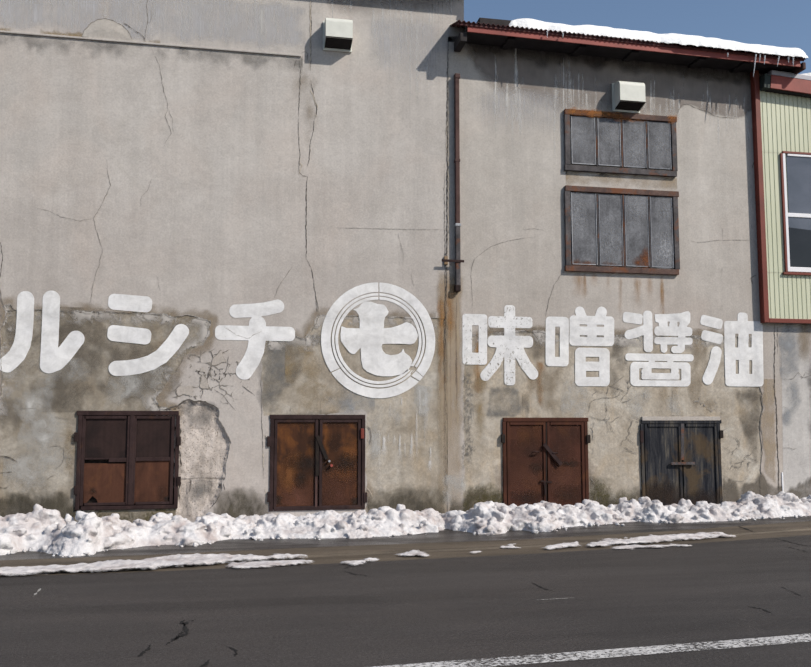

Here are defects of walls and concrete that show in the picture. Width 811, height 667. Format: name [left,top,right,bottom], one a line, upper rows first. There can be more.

water stain [332,0,447,14]
water stain [467,43,763,117]
crack [39,171,111,312]
crack [274,1,319,339]
crack [0,242,42,395]
flaking render [0,304,231,523]
crack [165,327,264,471]
corrosion [438,278,461,437]
crack [589,359,729,471]
water stain [738,379,774,439]
crack [724,323,811,490]
water stain [723,474,811,502]